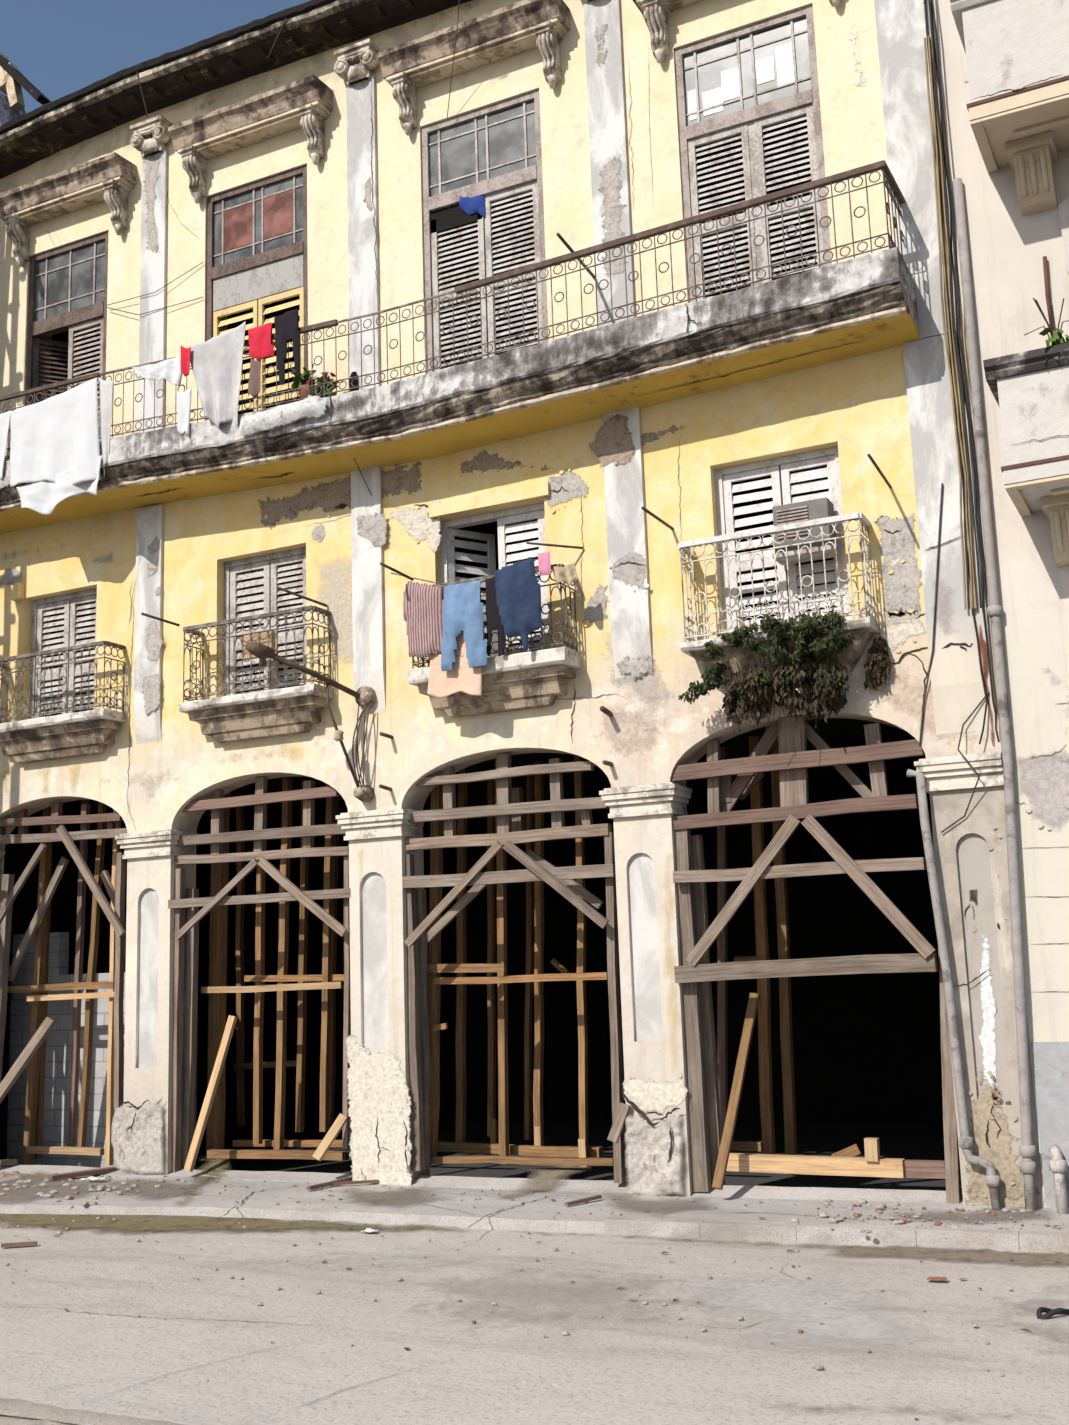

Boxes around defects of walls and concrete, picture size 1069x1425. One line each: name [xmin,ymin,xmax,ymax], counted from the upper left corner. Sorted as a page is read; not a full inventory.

damp [330,396,368,411]
peeling [589,414,681,467]
peeling [258,462,442,552]
peeling [461,450,589,513]
peeling [583,547,649,627]
peeling [873,513,927,653]
peeling [938,589,948,631]
peeling [616,654,654,679]
peeling [1015,754,1069,830]
spalling [345,1035,412,1185]
spalling [623,1073,688,1114]